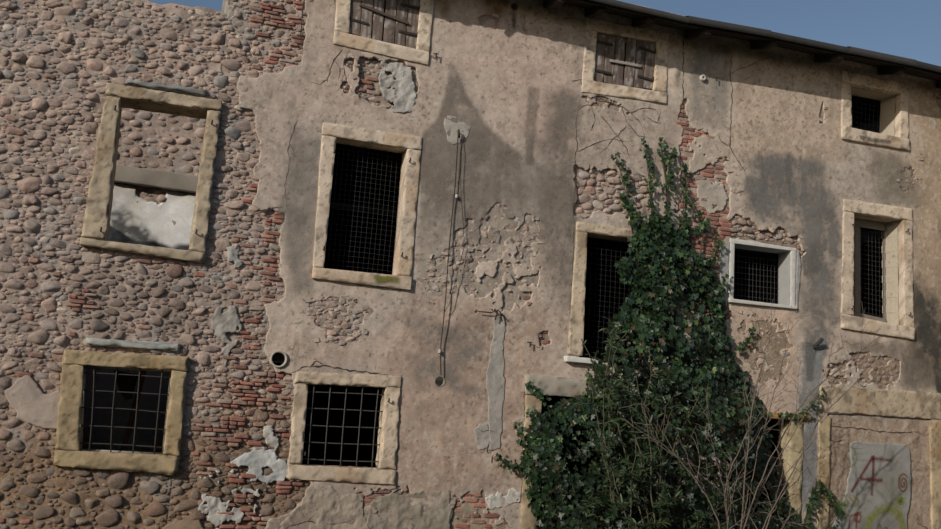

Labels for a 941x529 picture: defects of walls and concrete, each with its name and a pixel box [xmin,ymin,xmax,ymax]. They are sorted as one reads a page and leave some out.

spalling [341,53,419,107]
peeling [418,203,543,311]
damp [419,76,577,218]
spalling [573,164,653,221]
crack [569,34,684,316]
spalling [675,98,804,327]
crack [718,55,776,193]
peeling [302,295,374,348]
damp [746,154,840,508]
spalling [825,352,900,389]
peeling [163,425,288,529]
spalling [450,491,511,529]